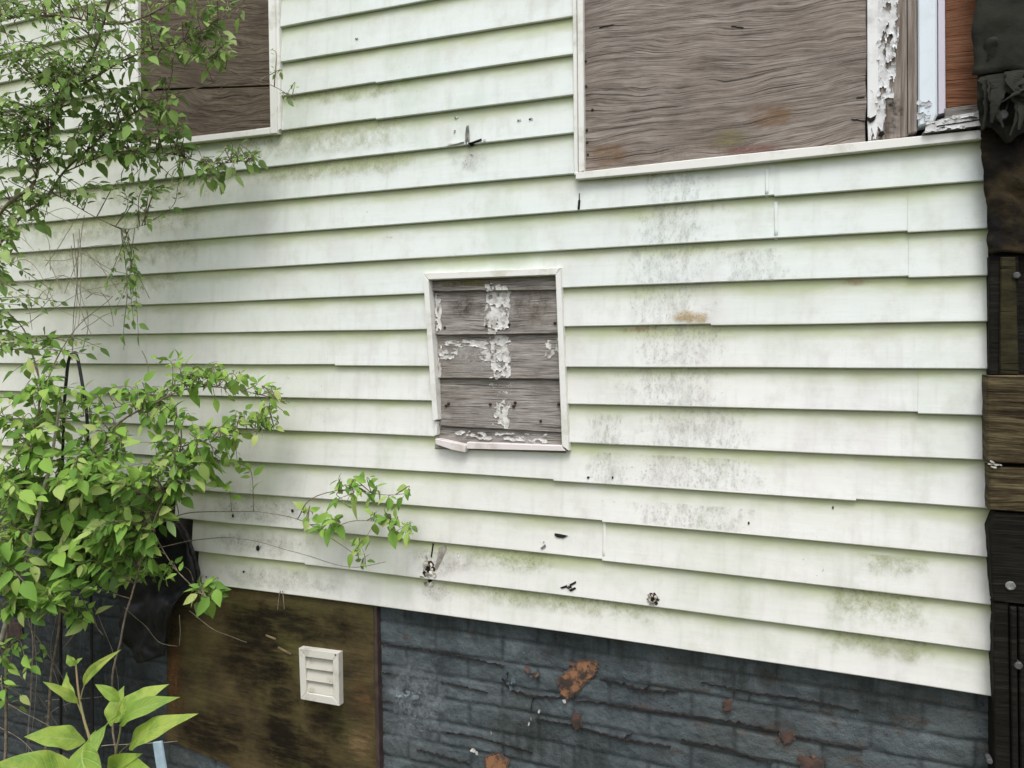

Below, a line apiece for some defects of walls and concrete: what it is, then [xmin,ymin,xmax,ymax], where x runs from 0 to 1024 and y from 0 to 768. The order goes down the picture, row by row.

peeling [867,0,899,140]
peeling [917,100,980,133]
peeling [435,283,548,444]
peeling [545,337,558,359]
spalling [556,659,599,731]